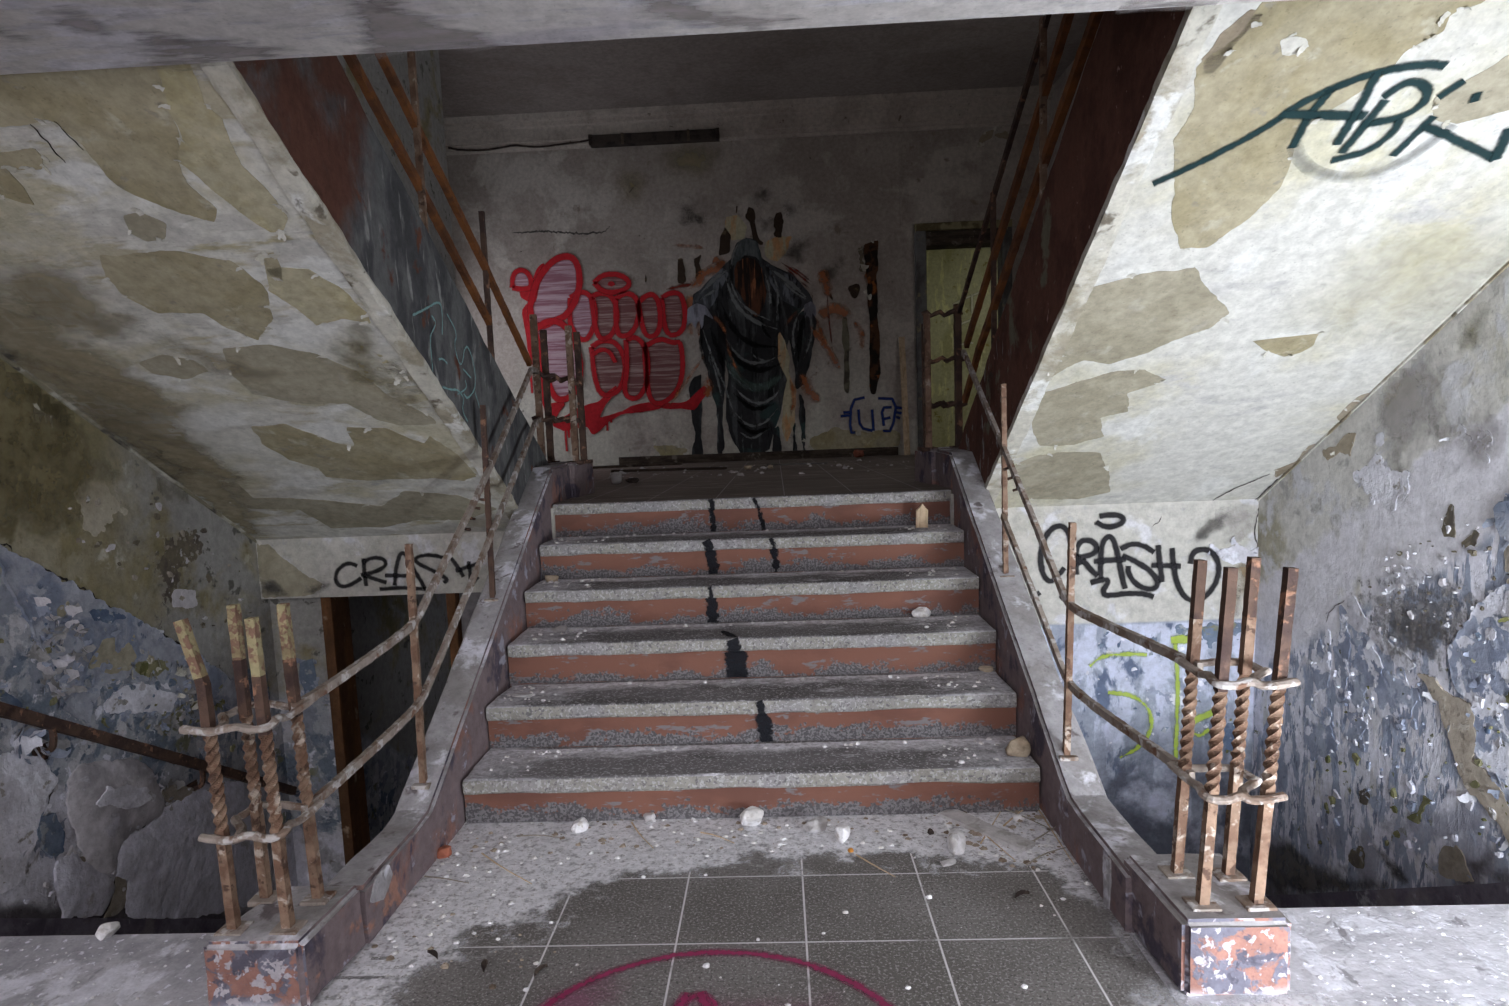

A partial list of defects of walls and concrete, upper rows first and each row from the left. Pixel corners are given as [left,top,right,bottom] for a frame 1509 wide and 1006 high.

peeling [1171,0,1485,250]
peeling [1430,55,1509,129]
damp [0,272,257,534]
peeling [0,64,496,529]
peeling [1015,267,1229,501]
peeling [1253,332,1325,358]
peeling [0,544,270,904]
peeling [66,478,240,628]
peeling [256,539,323,598]
peeling [1304,493,1509,869]
mould [1358,578,1479,667]
peeling [1432,834,1474,884]